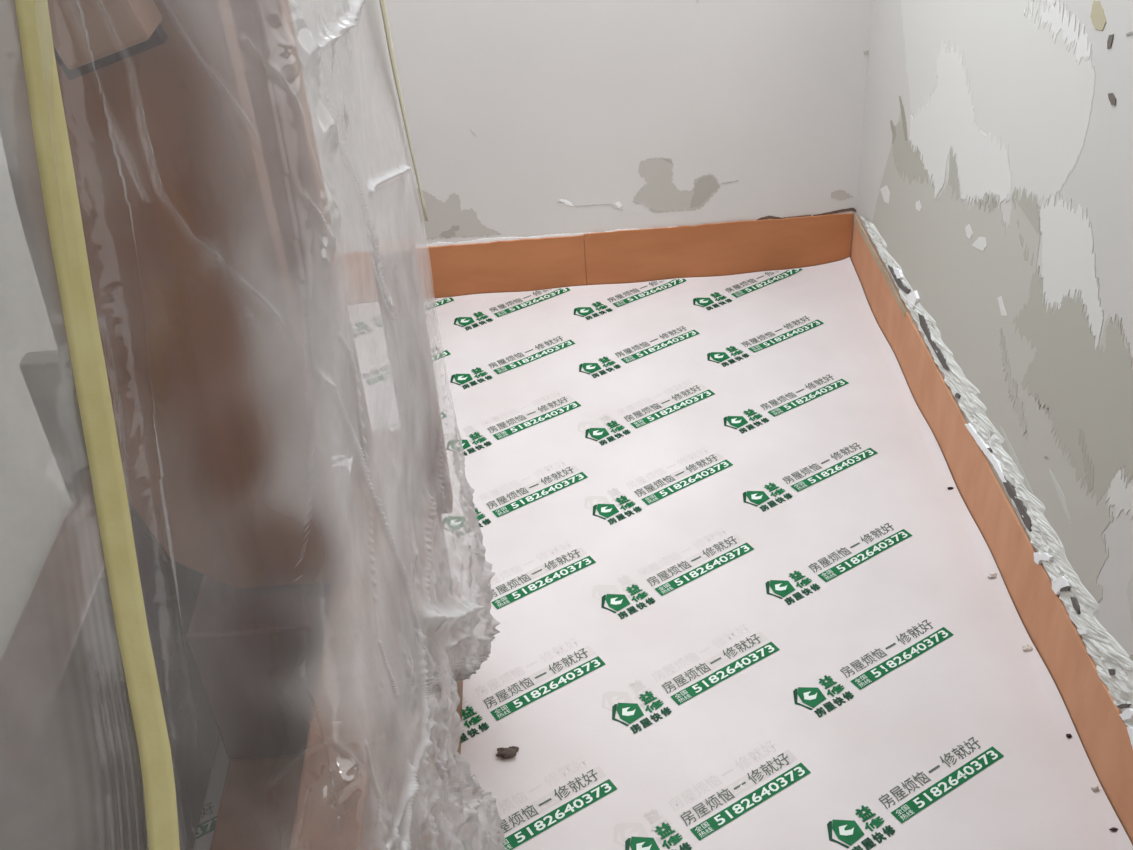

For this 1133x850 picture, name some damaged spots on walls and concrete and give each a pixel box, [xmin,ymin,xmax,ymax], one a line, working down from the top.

flaking render [615,157,720,213]
flaking render [416,188,501,240]
flaking render [860,111,1133,741]